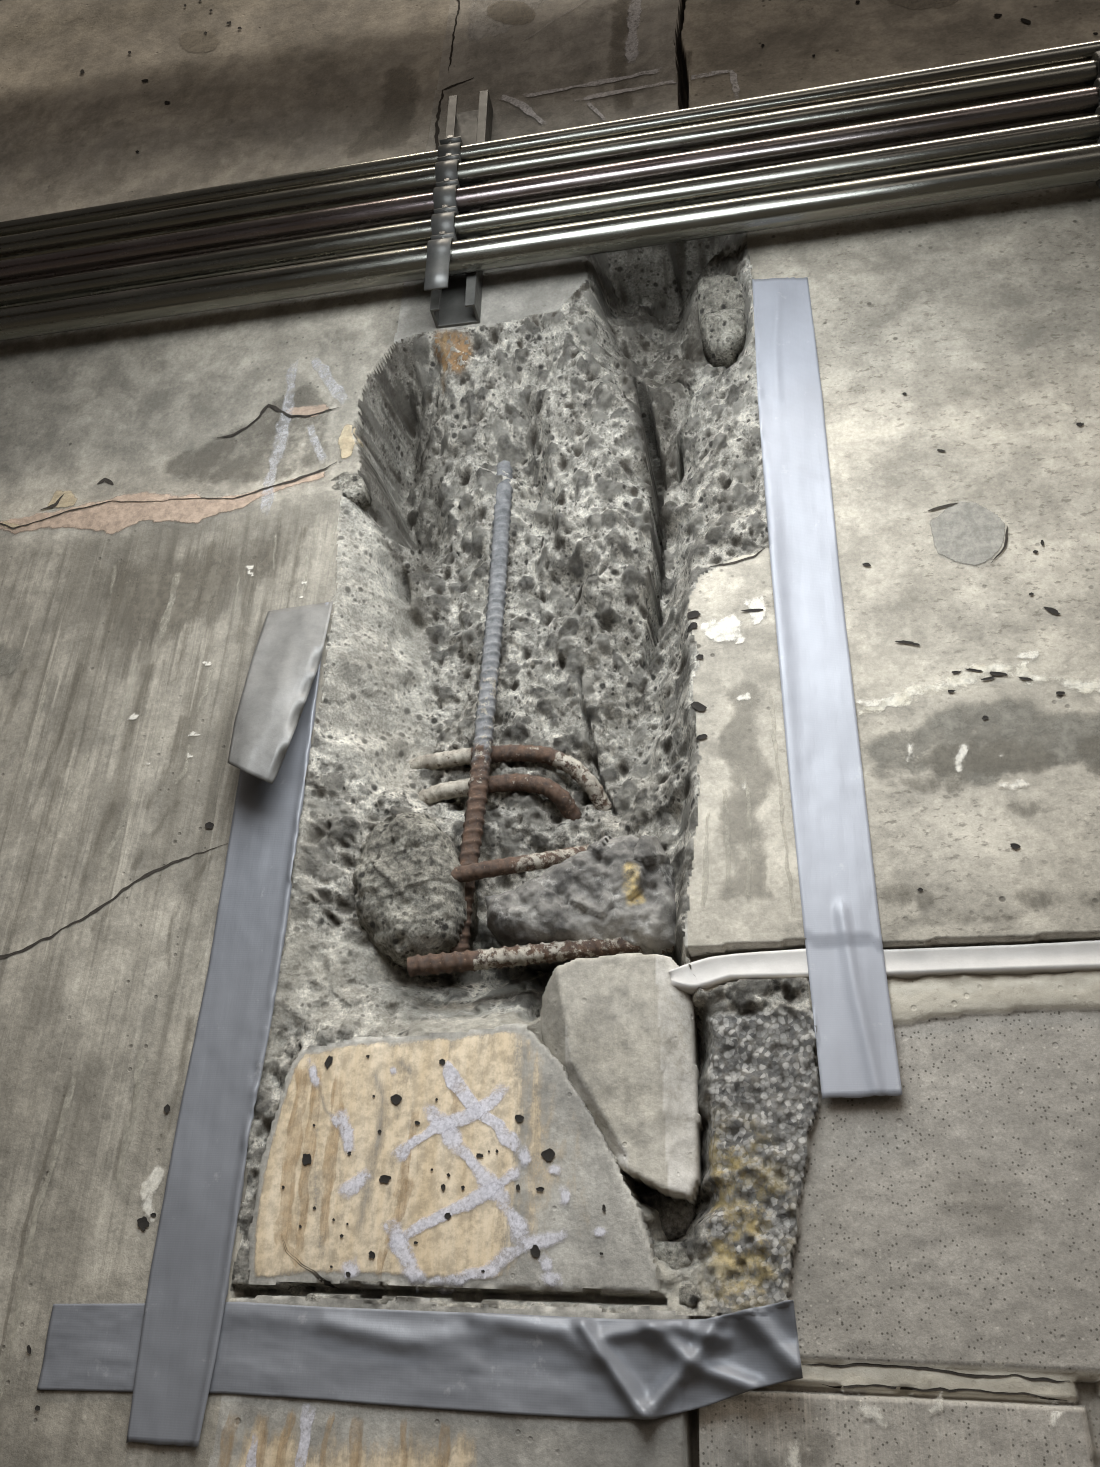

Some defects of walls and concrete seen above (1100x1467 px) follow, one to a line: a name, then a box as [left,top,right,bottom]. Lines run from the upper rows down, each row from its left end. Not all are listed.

crack [674,0,689,109]
spalling [0,232,820,1319]
water stain [858,651,1100,791]
crack [0,843,228,959]
crack [807,1363,1070,1401]